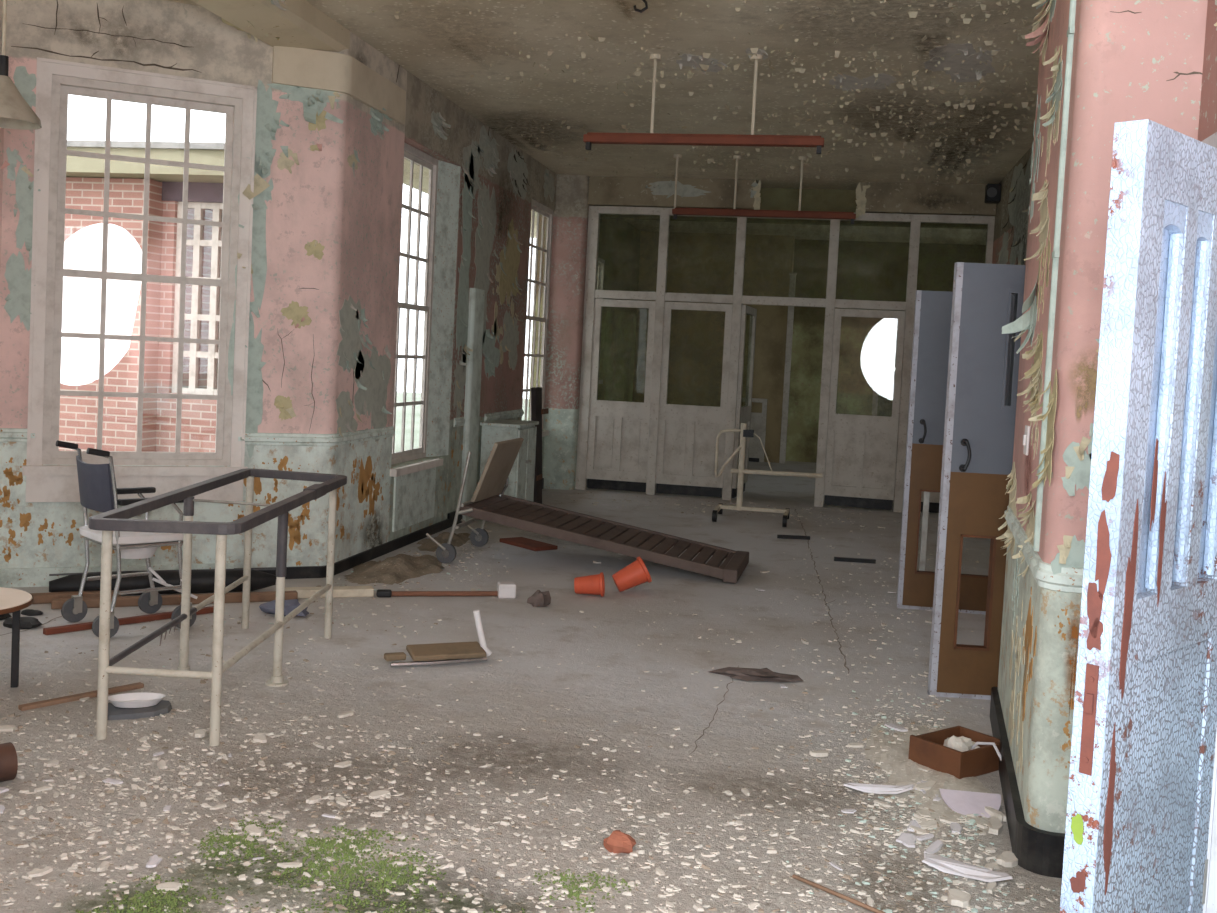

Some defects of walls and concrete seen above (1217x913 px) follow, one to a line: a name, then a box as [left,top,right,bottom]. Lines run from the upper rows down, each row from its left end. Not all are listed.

peeling [228,80,343,521]
peeling [336,295,392,442]
peeling [451,0,1120,774]
peeling [288,486,317,566]
crack [689,666,739,755]
crack [795,509,849,674]
rust [1068,619,1079,709]
peeling [1119,438,1167,698]